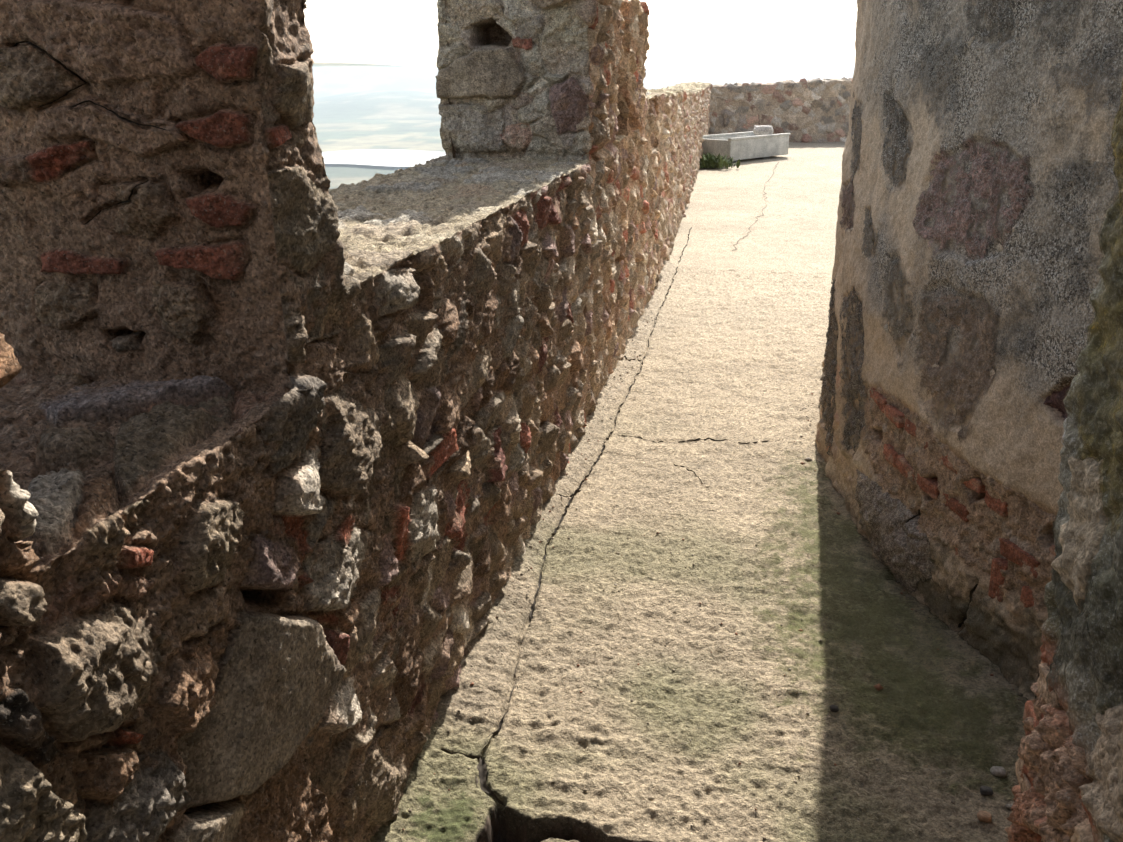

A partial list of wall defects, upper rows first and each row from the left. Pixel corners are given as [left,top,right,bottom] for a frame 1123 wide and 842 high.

crack [732,162,779,251]
crack [441,227,773,805]